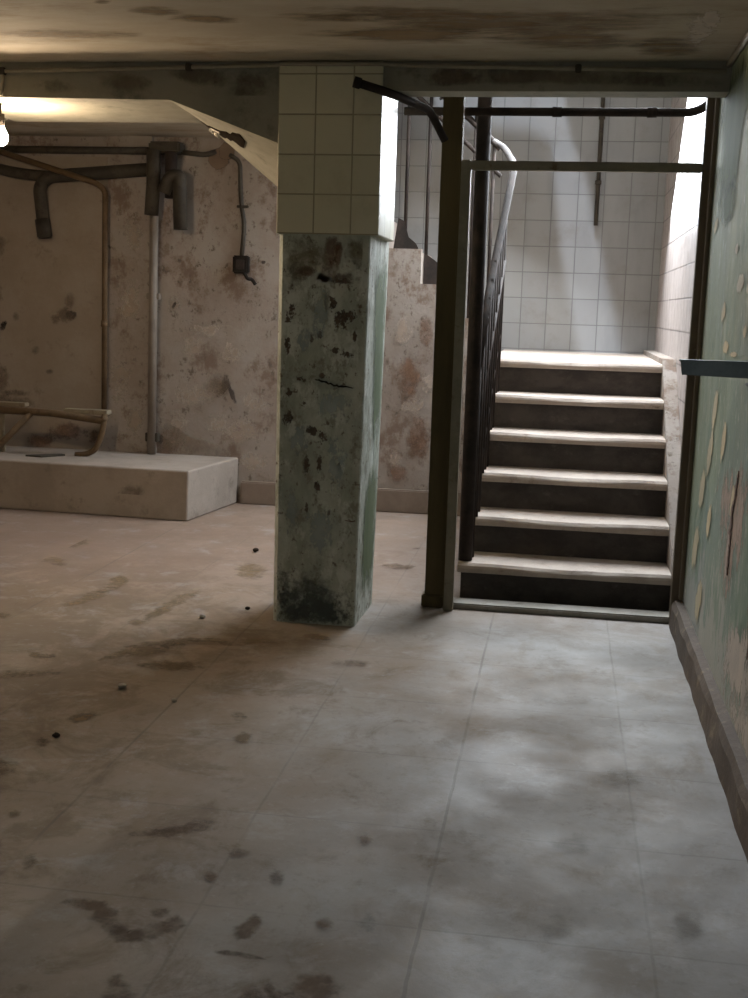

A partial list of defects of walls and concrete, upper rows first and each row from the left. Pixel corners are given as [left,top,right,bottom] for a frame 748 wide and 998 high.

peeling [692,390,726,567]
damp [100,638,276,670]
damp [280,572,338,623]
crack [717,467,748,668]
peeling [718,626,748,759]